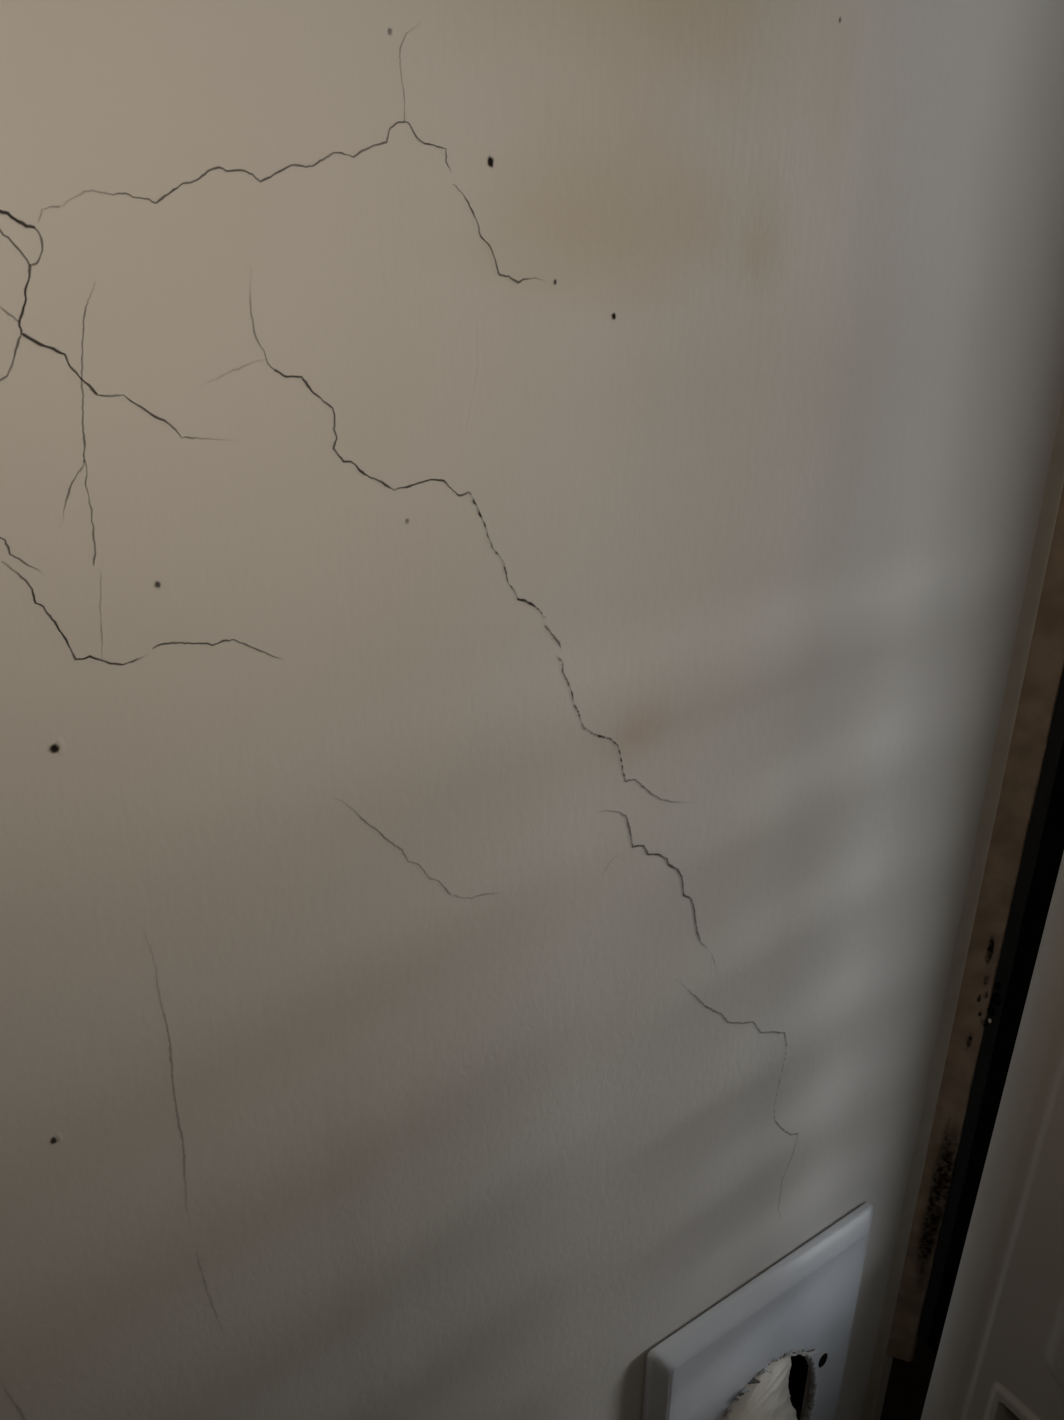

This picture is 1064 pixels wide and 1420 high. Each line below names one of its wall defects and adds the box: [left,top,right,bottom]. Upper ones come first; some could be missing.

crack [147,121,525,283]
crack [0,210,189,438]
crack [0,537,266,665]
crack [274,370,645,788]
crack [626,817,700,939]
damp [918,1133,954,1279]